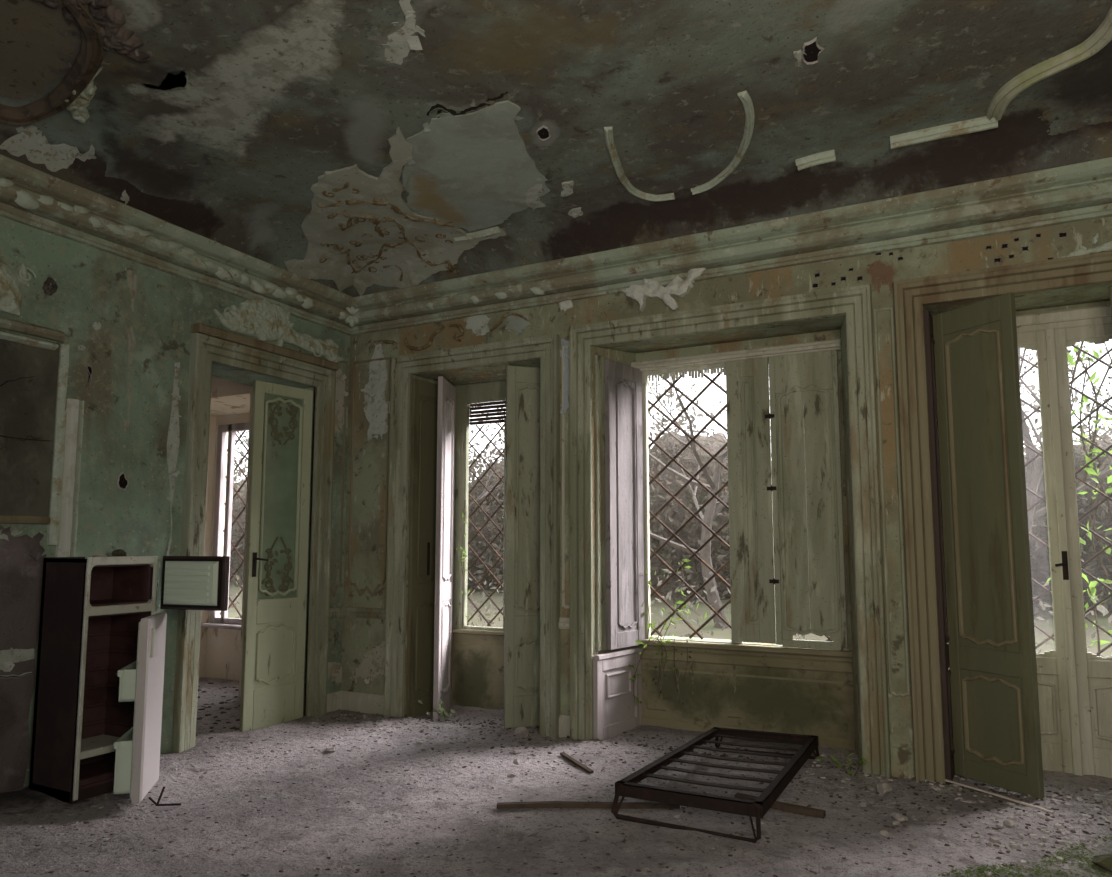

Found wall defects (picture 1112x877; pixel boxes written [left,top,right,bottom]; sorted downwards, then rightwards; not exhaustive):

flaking render [381,0,425,65]
damp [1037,27,1098,60]
flaking render [0,125,96,172]
flaking render [402,100,583,232]
damp [537,40,1112,262]
peeling [335,343,390,442]
flaking render [0,525,47,793]